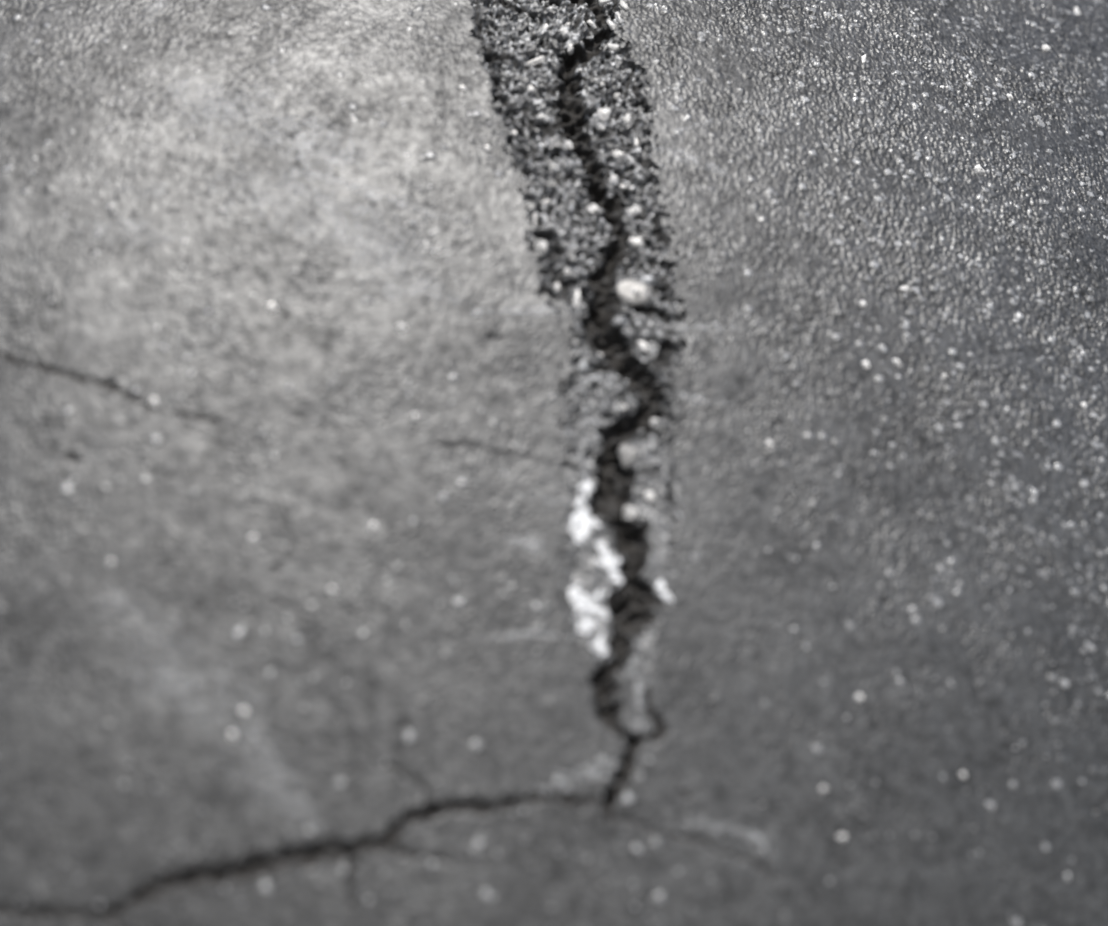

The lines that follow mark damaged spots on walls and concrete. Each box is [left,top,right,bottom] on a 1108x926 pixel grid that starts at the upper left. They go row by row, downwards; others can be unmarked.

crack [0,0,774,926]
spalling [470,0,688,678]